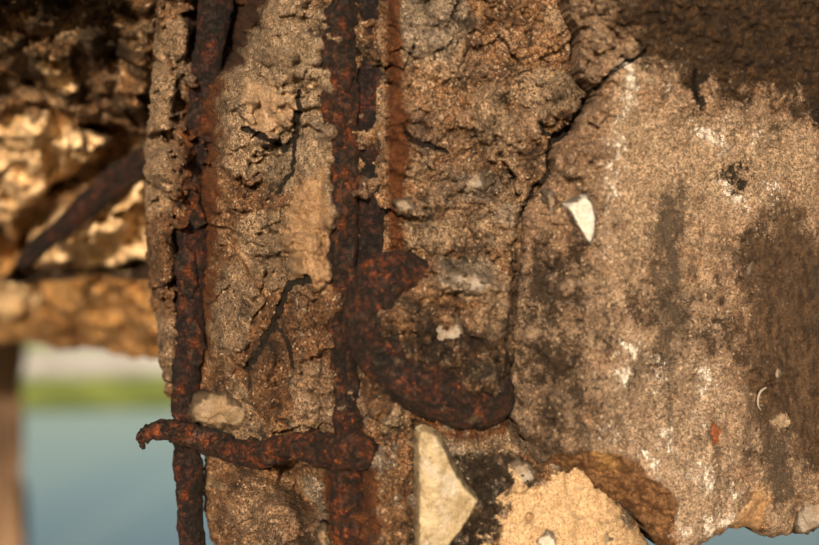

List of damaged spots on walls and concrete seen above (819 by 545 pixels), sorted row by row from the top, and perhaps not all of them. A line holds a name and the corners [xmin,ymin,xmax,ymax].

spalling [0,107,104,220]
crack [2,258,150,287]
spalling [22,177,147,274]
corrosion [172,78,229,321]
crack [241,89,303,195]
crack [243,274,312,371]
spalling [278,160,339,295]
corrosion [383,0,416,252]
crack [519,38,646,216]
corrosion [349,468,389,545]
leakage [451,451,529,545]
spalling [544,451,678,545]